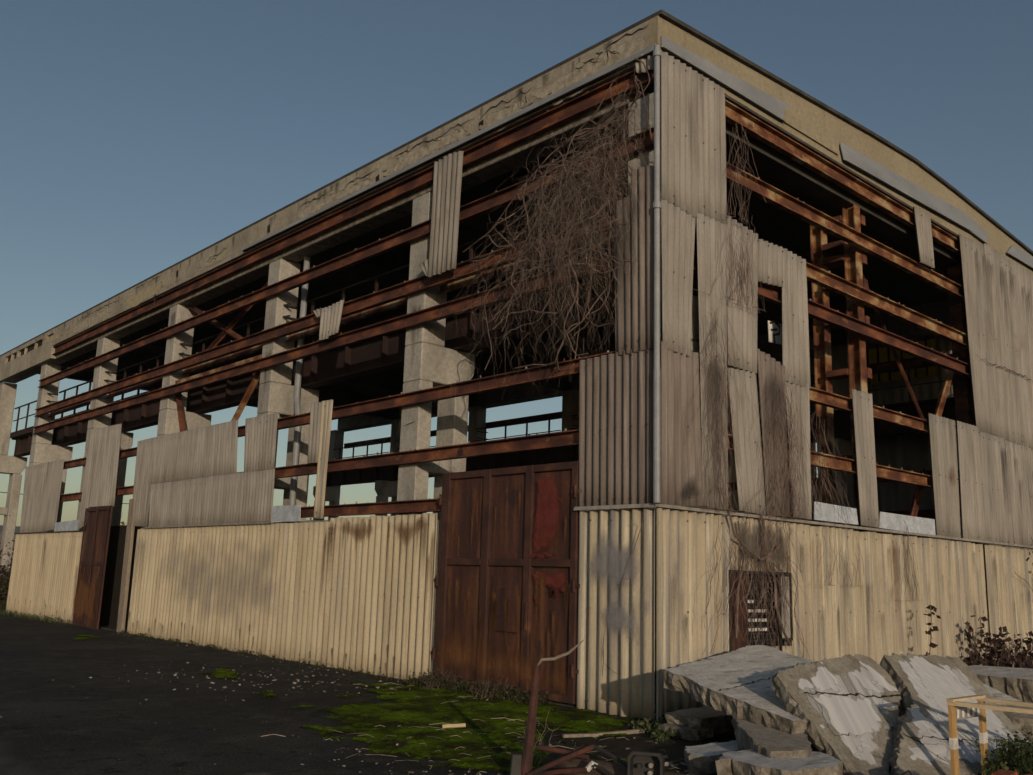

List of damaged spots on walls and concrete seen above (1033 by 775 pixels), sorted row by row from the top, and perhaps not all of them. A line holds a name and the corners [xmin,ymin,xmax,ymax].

crack [577,24,649,73]
crack [295,90,529,211]
rust [73,567,97,622]
crack [804,691,901,738]
crack [887,727,1029,761]